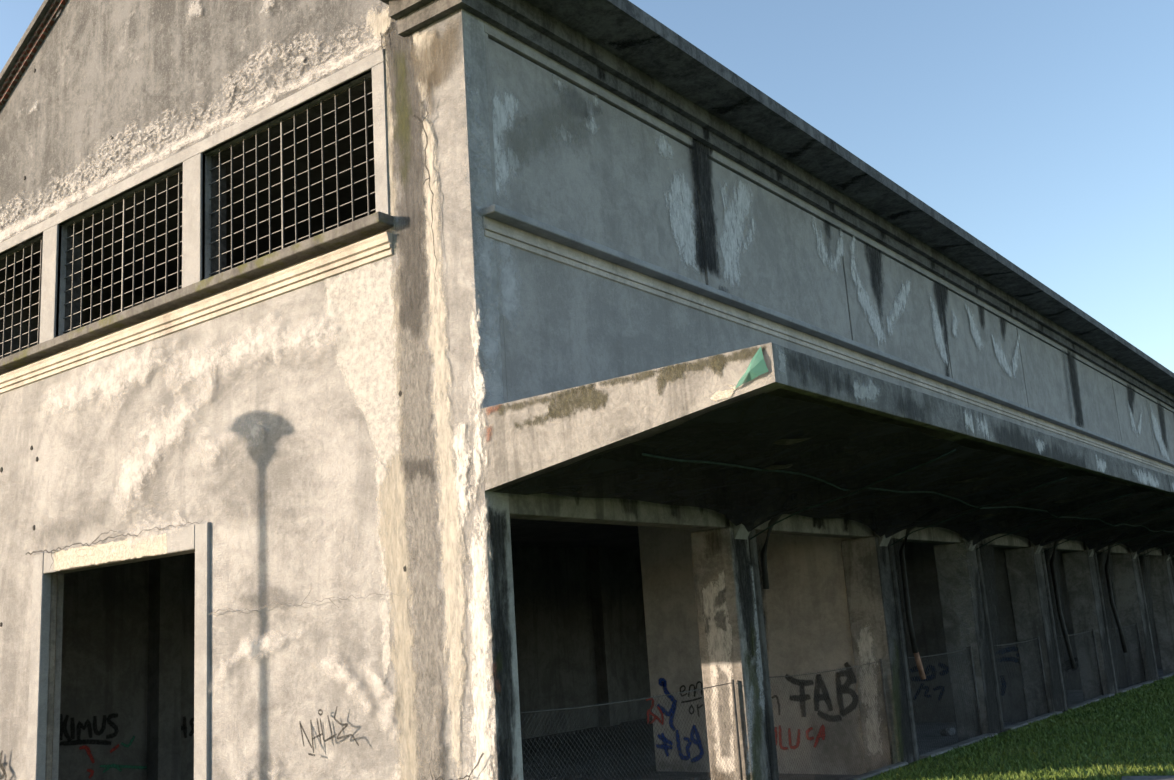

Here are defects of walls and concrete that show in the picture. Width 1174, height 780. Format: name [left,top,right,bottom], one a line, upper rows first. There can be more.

damp [664,128,756,293]
damp [385,25,458,780]
damp [497,346,766,427]
damp [778,351,879,402]
damp [812,201,910,345]
damp [930,261,1041,377]
damp [964,411,1106,473]
damp [1067,329,1096,428]
damp [1132,468,1159,487]
crack [26,521,202,568]
damp [488,507,515,780]
damp [706,529,767,677]